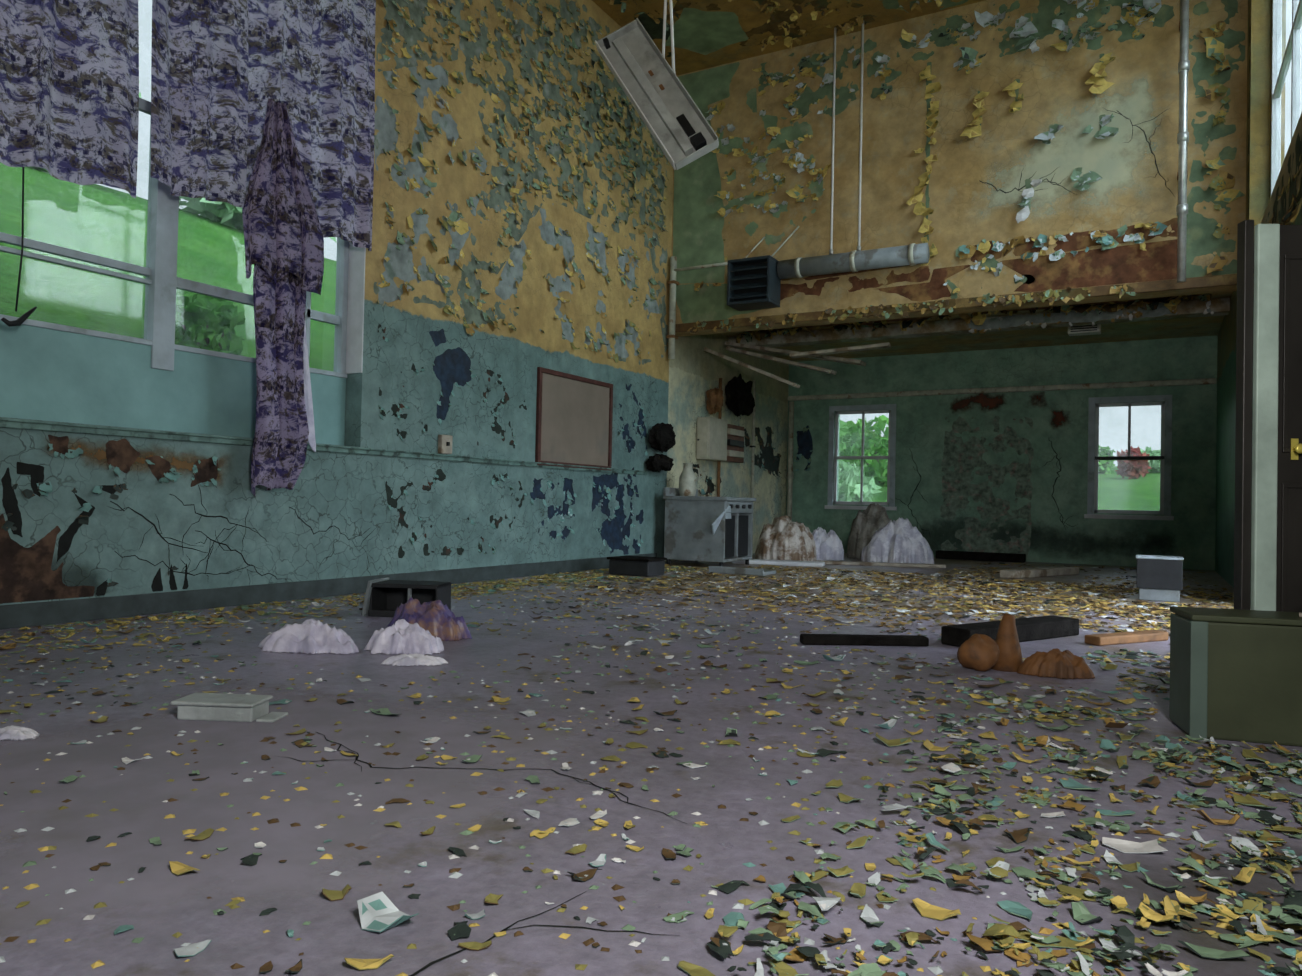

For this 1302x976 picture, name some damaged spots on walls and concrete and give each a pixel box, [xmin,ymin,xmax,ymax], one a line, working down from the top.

peeling [373,0,1250,448]
peeling [1266,133,1302,225]
peeling [12,481,53,499]
spalling [0,513,119,604]
spalling [47,435,84,459]
spalling [72,438,222,525]
crack [110,473,293,584]
crack [289,507,376,576]
peeling [385,384,649,558]
crack [409,892,680,976]